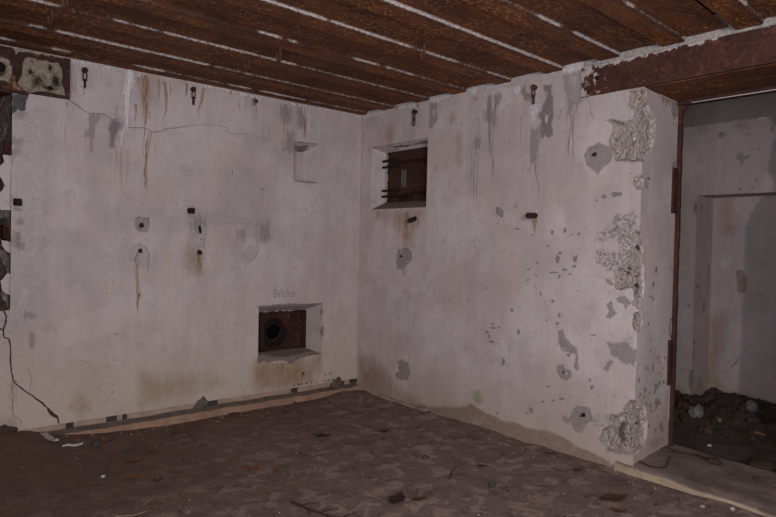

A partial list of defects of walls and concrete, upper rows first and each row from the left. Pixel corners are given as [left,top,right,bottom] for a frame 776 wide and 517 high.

peeling [12,57,65,118]
crack [69,100,192,133]
damp [430,93,451,127]
damp [468,62,585,174]
spalling [584,87,656,174]
spalling [596,214,657,371]
crack [0,308,59,424]
peeling [546,313,578,380]
spalling [599,400,647,455]